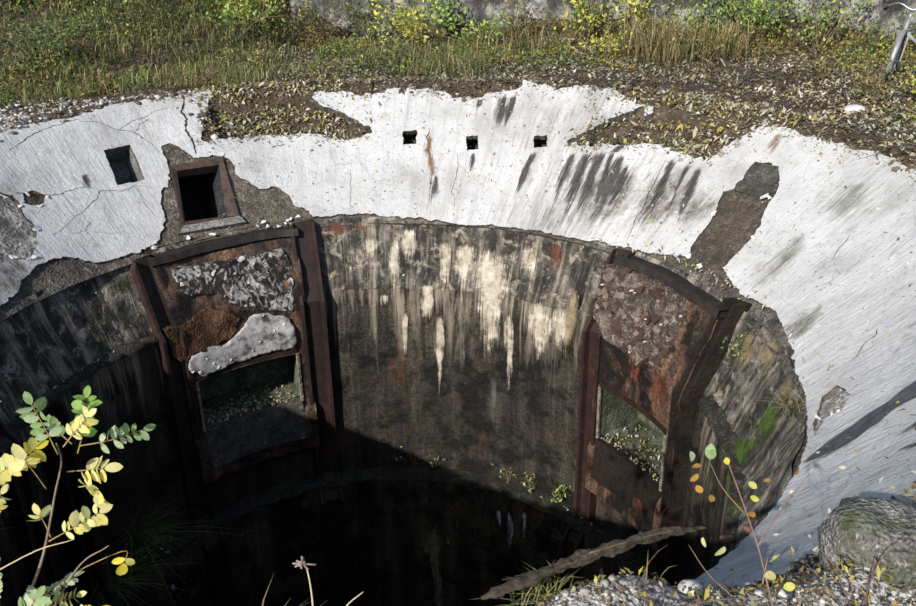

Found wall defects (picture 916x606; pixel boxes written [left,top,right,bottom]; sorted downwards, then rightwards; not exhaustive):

spalling [0,191,49,262]
crack [0,177,156,246]
crack [11,98,196,154]
spalling [59,88,313,251]
corrosion [425,135,434,173]
water stain [555,145,629,218]
water stain [645,160,700,221]
spalling [685,191,772,270]
water stain [380,229,416,304]
corrosion [161,308,240,362]
water stain [421,244,514,384]
spalling [814,388,850,433]